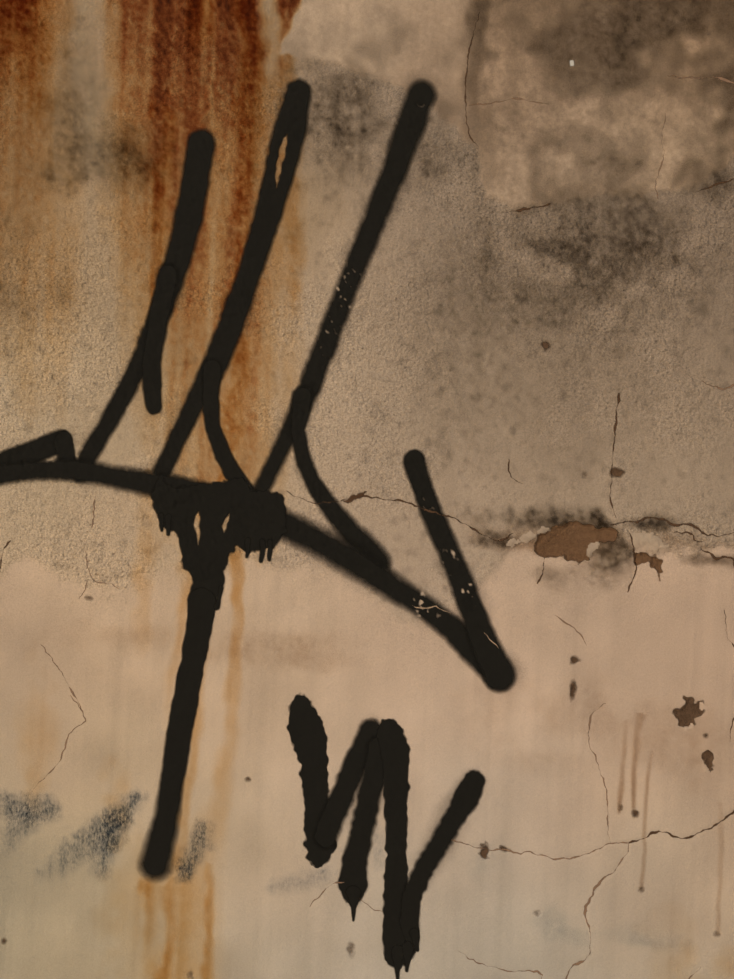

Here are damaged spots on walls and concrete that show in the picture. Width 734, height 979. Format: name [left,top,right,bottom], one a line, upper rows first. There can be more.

rust [280,0,298,15]
rust [138,0,258,138]
crack [287,491,513,541]
crack [610,393,734,592]
peeling [506,521,618,564]
peeling [631,531,669,581]
crack [41,645,86,781]
spalling [673,696,708,731]
spalling [702,750,714,773]
crack [451,703,734,930]
crack [466,956,543,979]